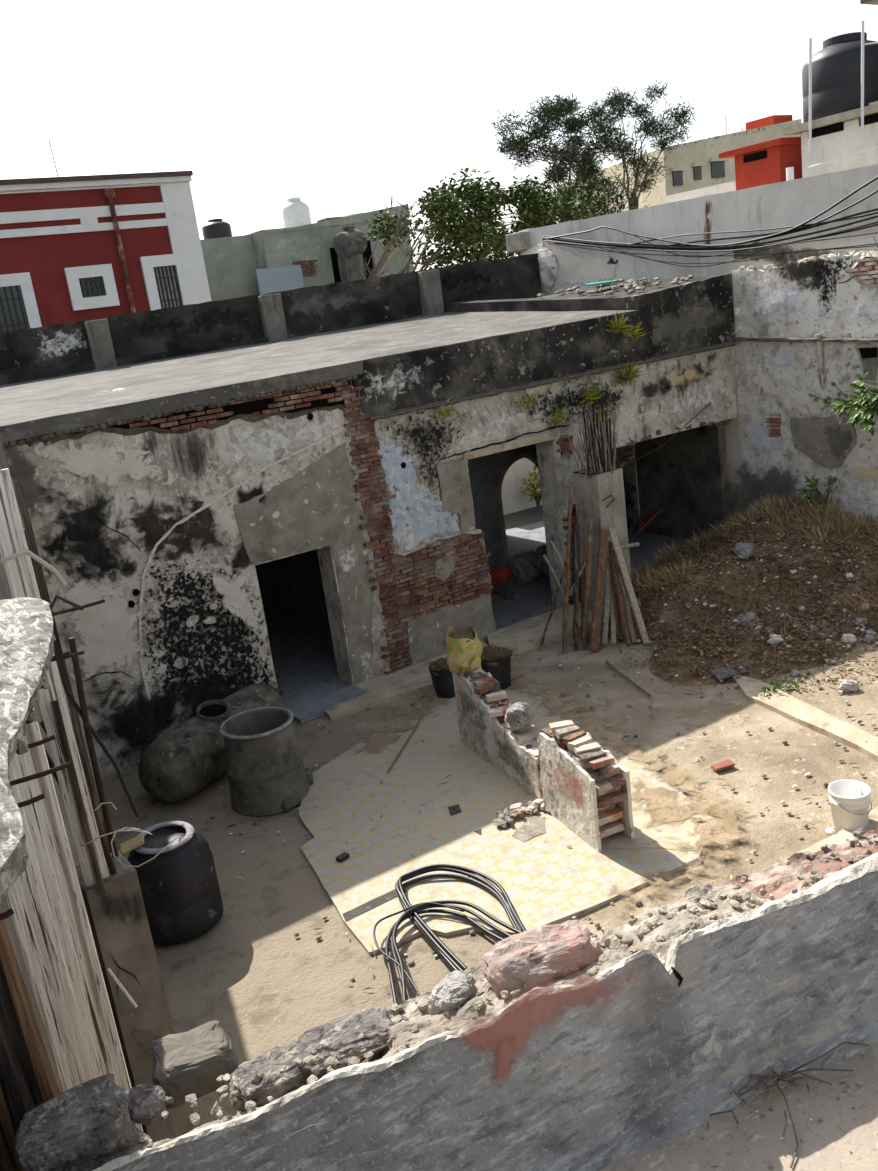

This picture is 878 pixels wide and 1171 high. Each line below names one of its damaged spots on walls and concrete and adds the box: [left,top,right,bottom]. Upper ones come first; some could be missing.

water stain [733,242,858,318]
flaking render [797,250,878,288]
water stain [519,373,627,429]
water stain [642,354,716,421]
spalling [855,342,878,386]
flaking render [3,374,493,695]
water stain [6,430,263,764]